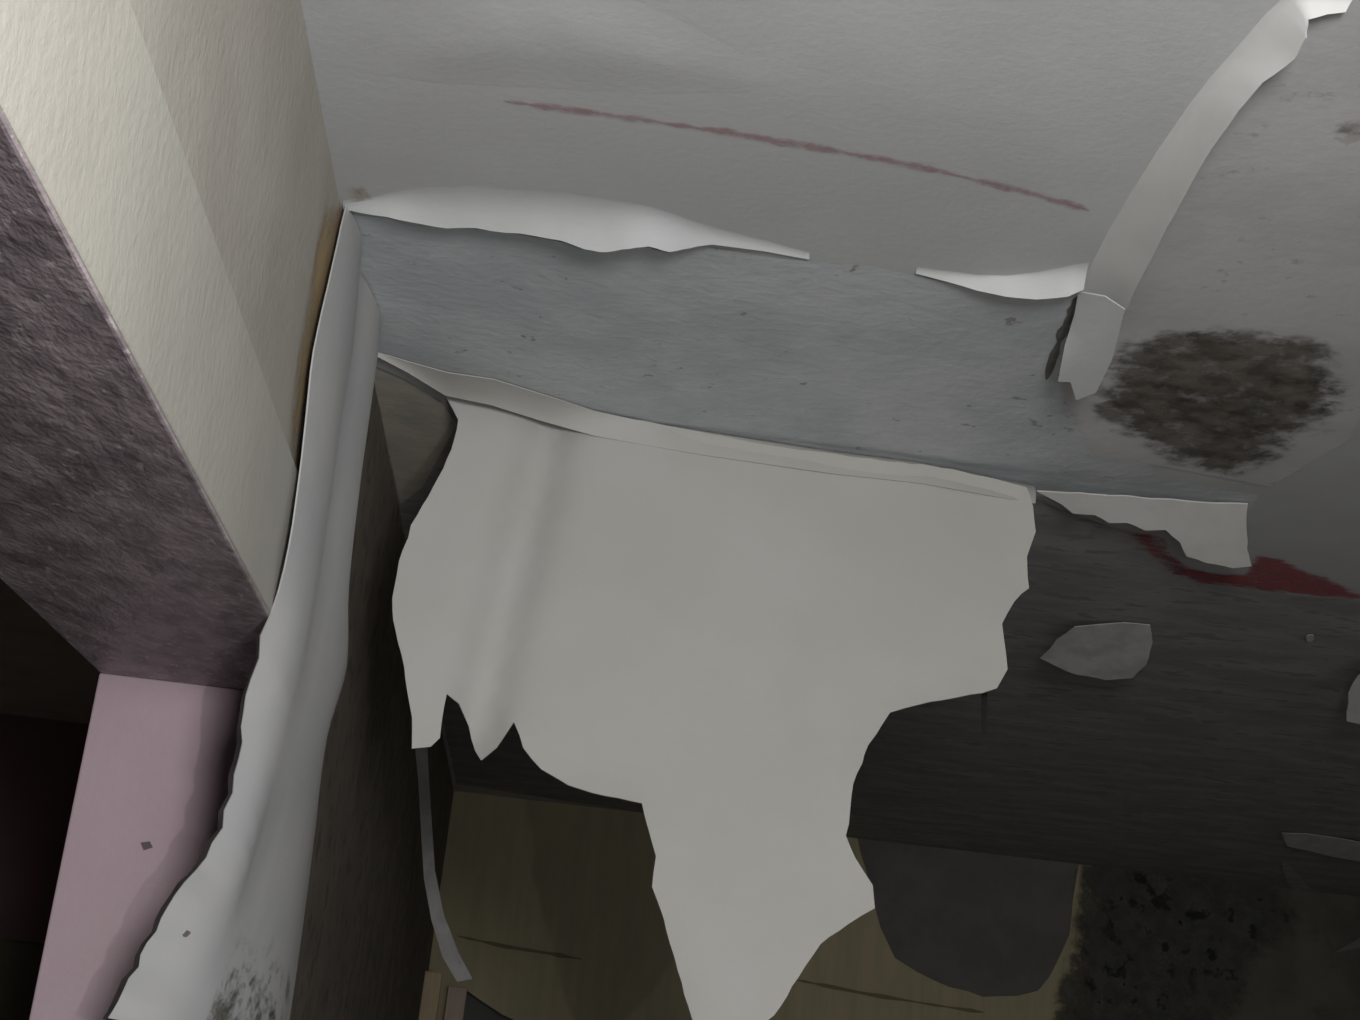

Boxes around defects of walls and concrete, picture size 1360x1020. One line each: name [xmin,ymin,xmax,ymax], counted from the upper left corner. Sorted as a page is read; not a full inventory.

water stain [1096,331,1333,470]
peeling [290,0,1360,1020]
water stain [213,973,289,1020]
water stain [1055,865,1360,1020]